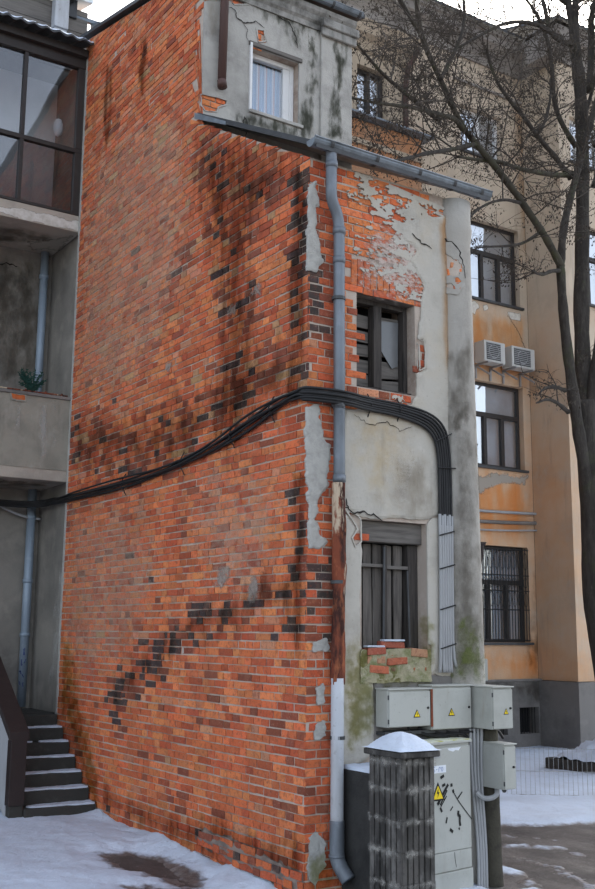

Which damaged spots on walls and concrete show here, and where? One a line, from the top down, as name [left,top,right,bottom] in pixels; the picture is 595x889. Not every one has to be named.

flaking render [309,160,326,194]
flaking render [307,209,333,388]
flaking render [337,168,444,405]